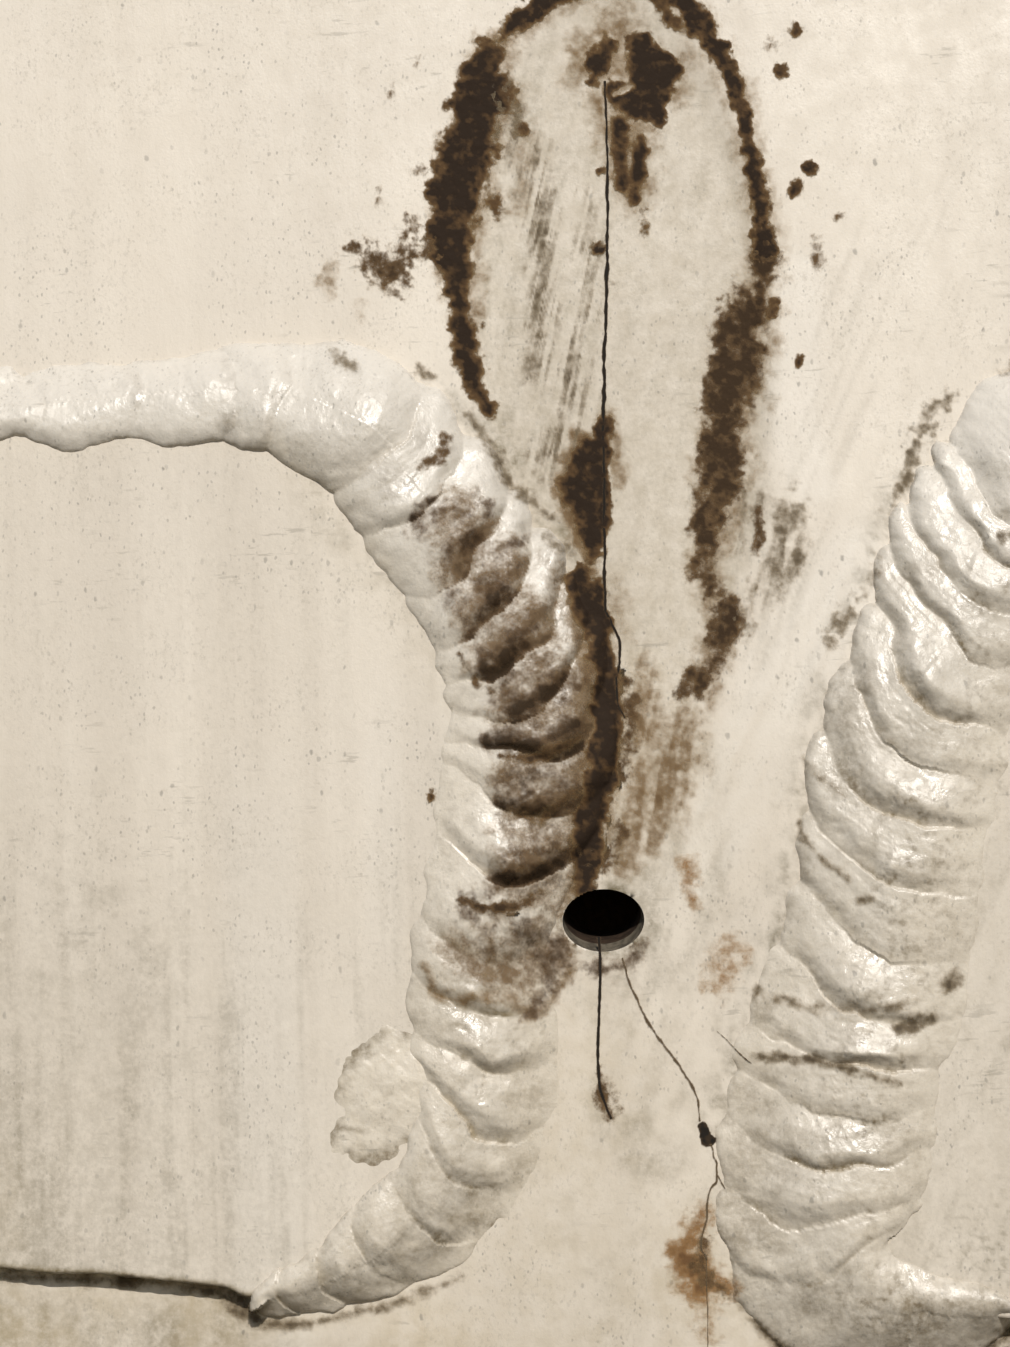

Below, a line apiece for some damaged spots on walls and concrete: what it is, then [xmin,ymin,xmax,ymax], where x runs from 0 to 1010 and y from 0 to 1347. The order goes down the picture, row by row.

rust [773,62,790,79]
rust [789,22,803,38]
rust [342,0,580,420]
rust [787,159,819,199]
crack [601,81,625,718]
rust [795,353,805,368]
rust [409,0,783,1019]
crack [596,937,725,1347]
rust [665,1209,740,1303]